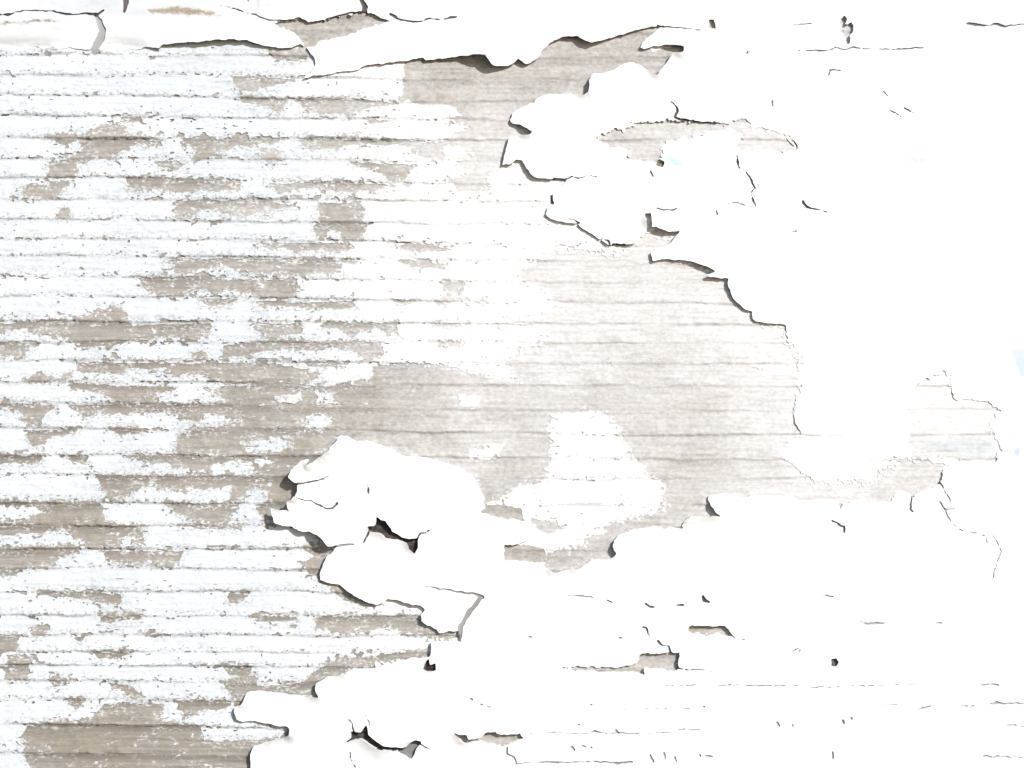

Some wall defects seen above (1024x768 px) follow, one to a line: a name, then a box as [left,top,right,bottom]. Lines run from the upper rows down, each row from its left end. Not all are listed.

peeling [20,113,163,220]
peeling [126,13,704,311]
peeling [596,119,797,167]
peeling [0,230,1002,768]